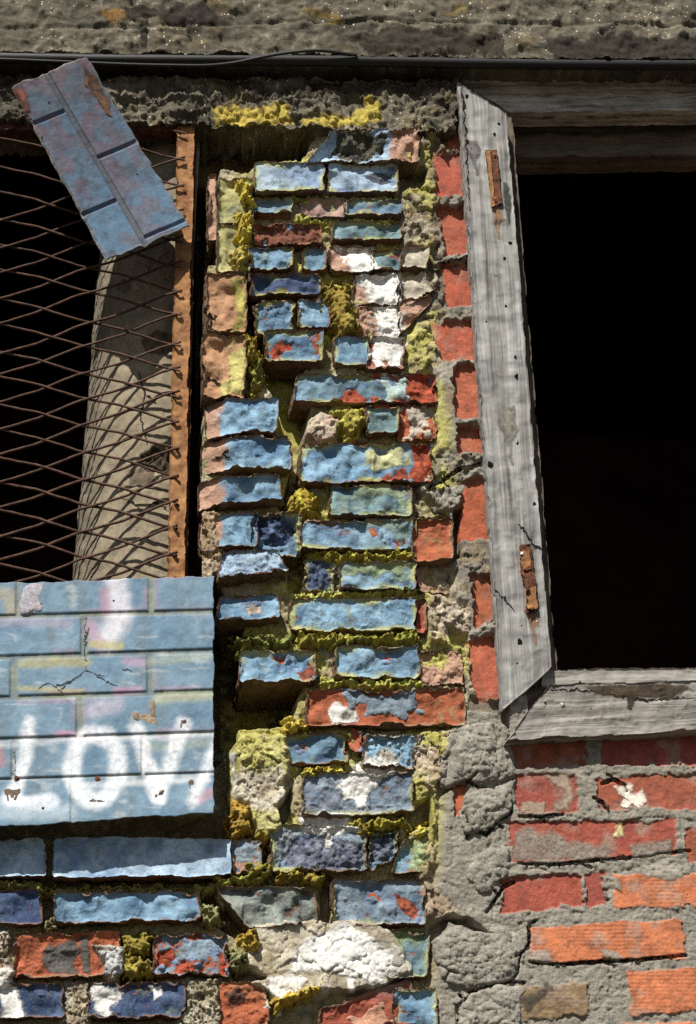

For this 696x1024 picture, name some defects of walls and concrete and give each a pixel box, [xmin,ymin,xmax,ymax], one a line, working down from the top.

rust [492,205,504,238]
spalling [267,337,292,360]
spalling [311,326,321,360]
spalling [333,372,437,489]
crack [518,524,542,550]
peeling [21,602,43,616]
crack [39,617,132,692]
peeling [341,688,424,721]
peeling [98,947,125,976]
spalling [152,933,230,976]